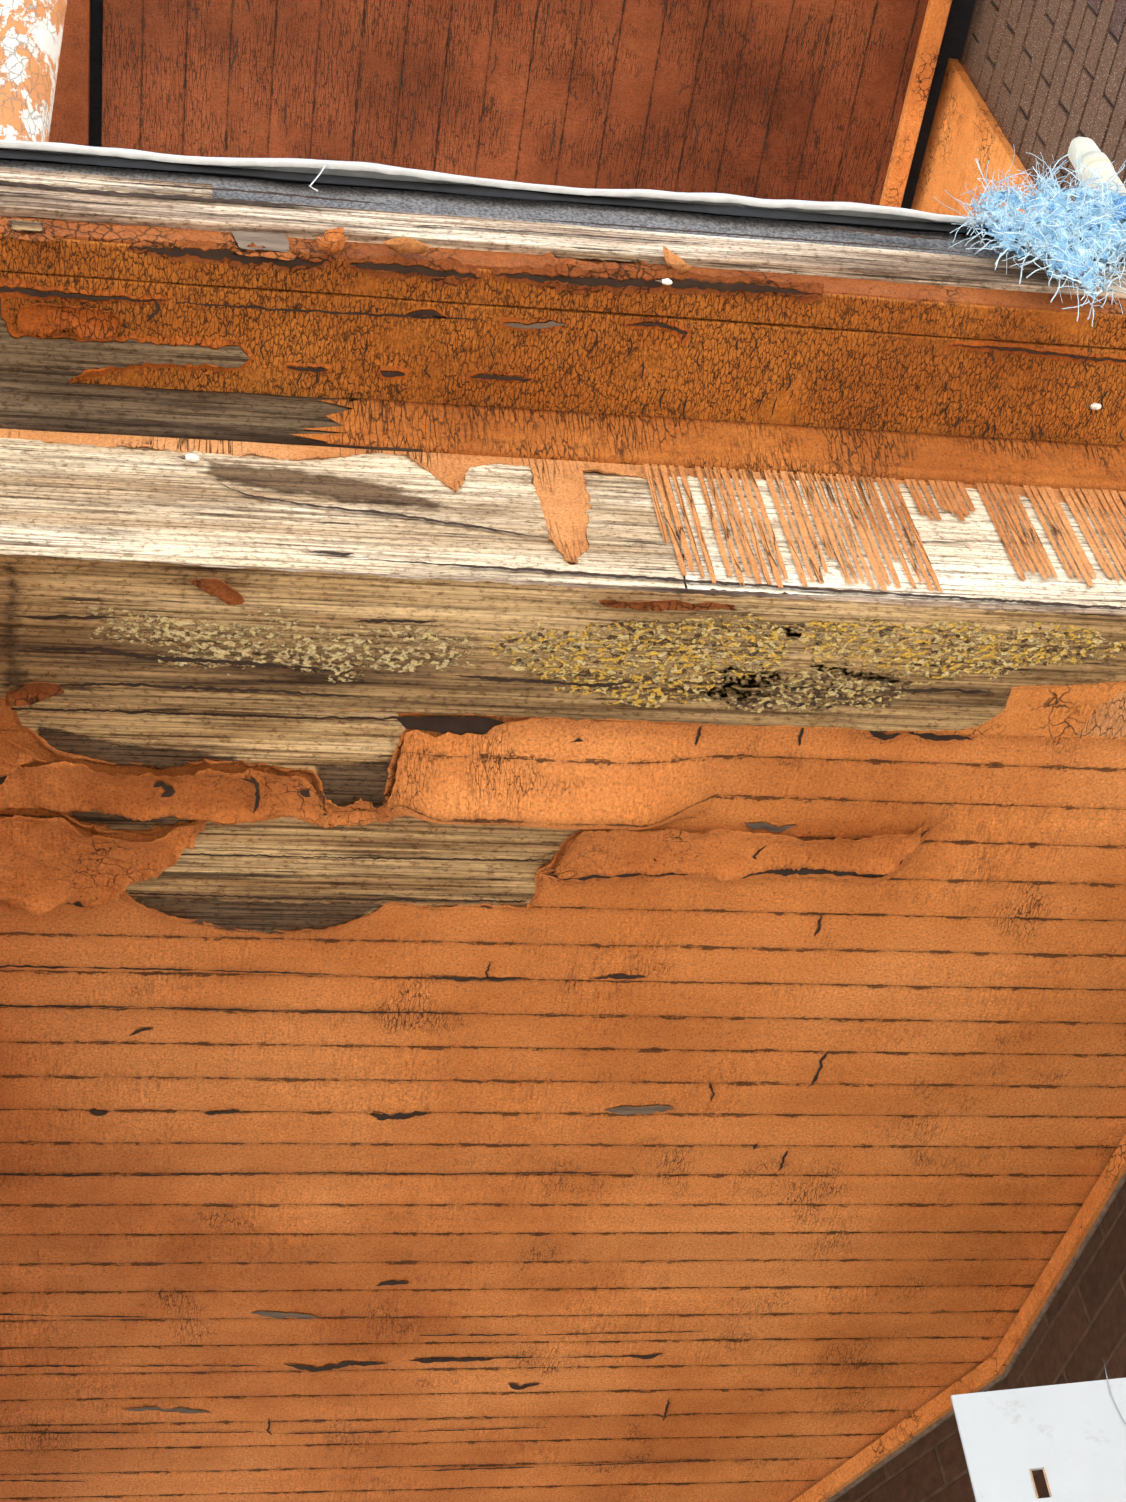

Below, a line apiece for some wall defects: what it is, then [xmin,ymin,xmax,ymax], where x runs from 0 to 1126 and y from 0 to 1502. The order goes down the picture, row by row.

peeling [3,219,54,241]
peeling [226,230,296,260]
peeling [316,227,348,255]
peeling [383,238,431,254]
peeling [542,246,693,274]
peeling [0,295,255,383]
peeling [41,439,1126,611]
peeling [914,681,1126,735]
peeling [0,682,921,935]